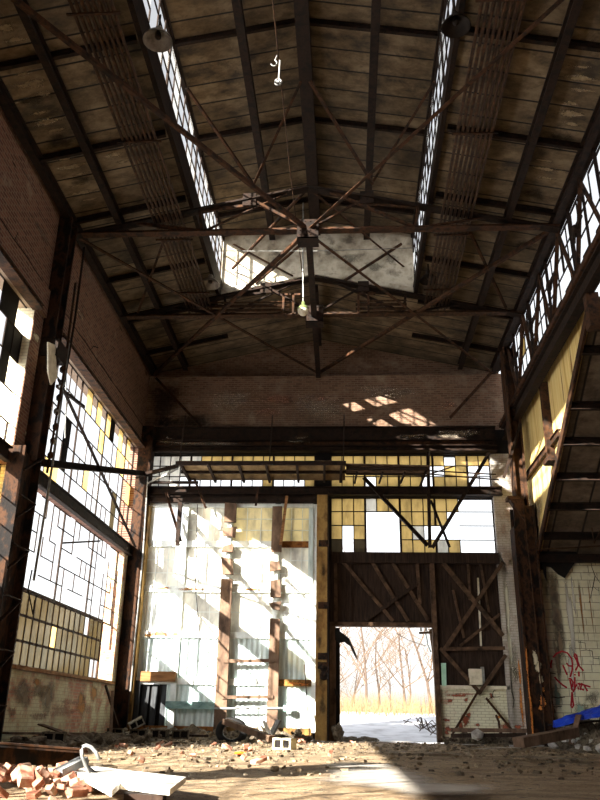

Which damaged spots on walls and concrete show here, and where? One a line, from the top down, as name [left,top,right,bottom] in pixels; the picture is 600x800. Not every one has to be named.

leakage [543,574,576,718]
peeling [443,713,480,735]